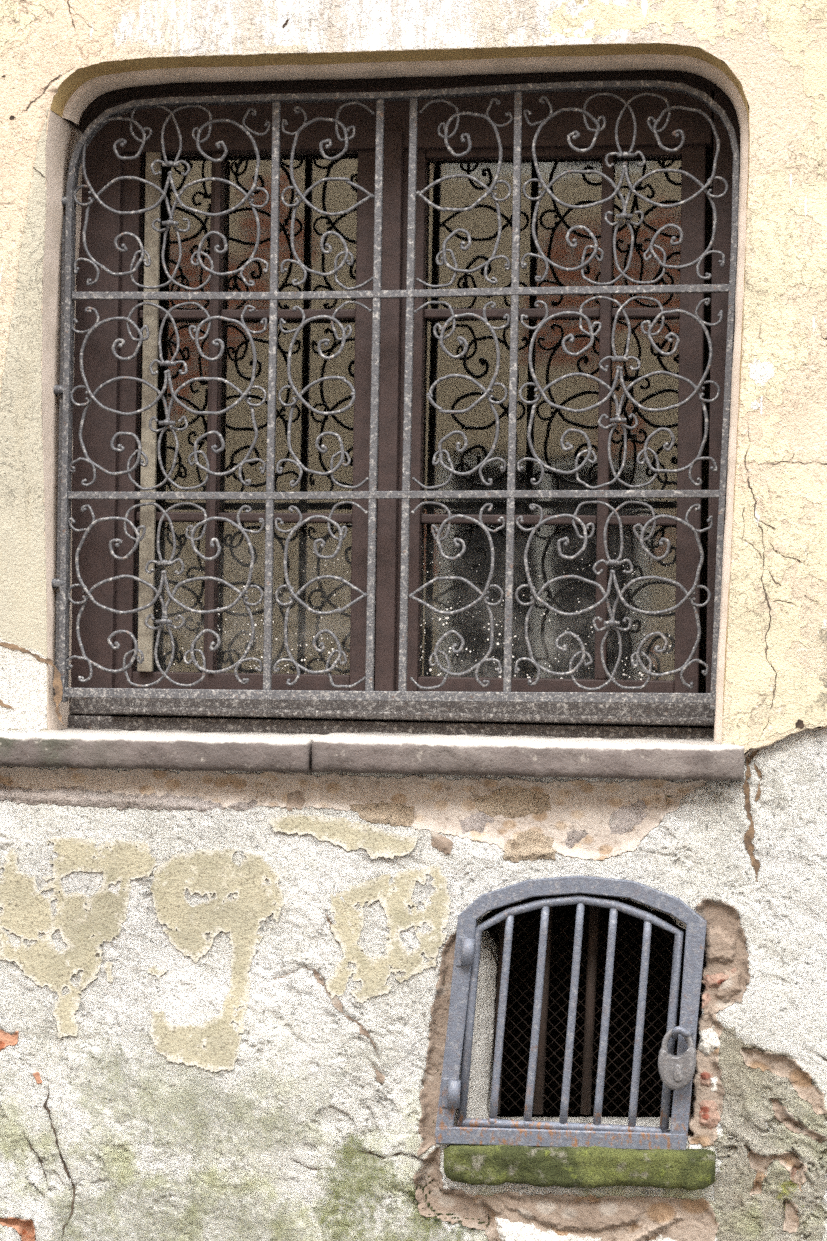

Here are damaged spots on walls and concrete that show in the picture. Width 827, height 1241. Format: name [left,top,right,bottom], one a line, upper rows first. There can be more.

crack [19,1,93,112]
peeling [542,0,827,758]
crack [0,642,64,724]
crack [739,418,827,882]
crack [24,1090,75,1234]
flaking render [0,766,827,1241]